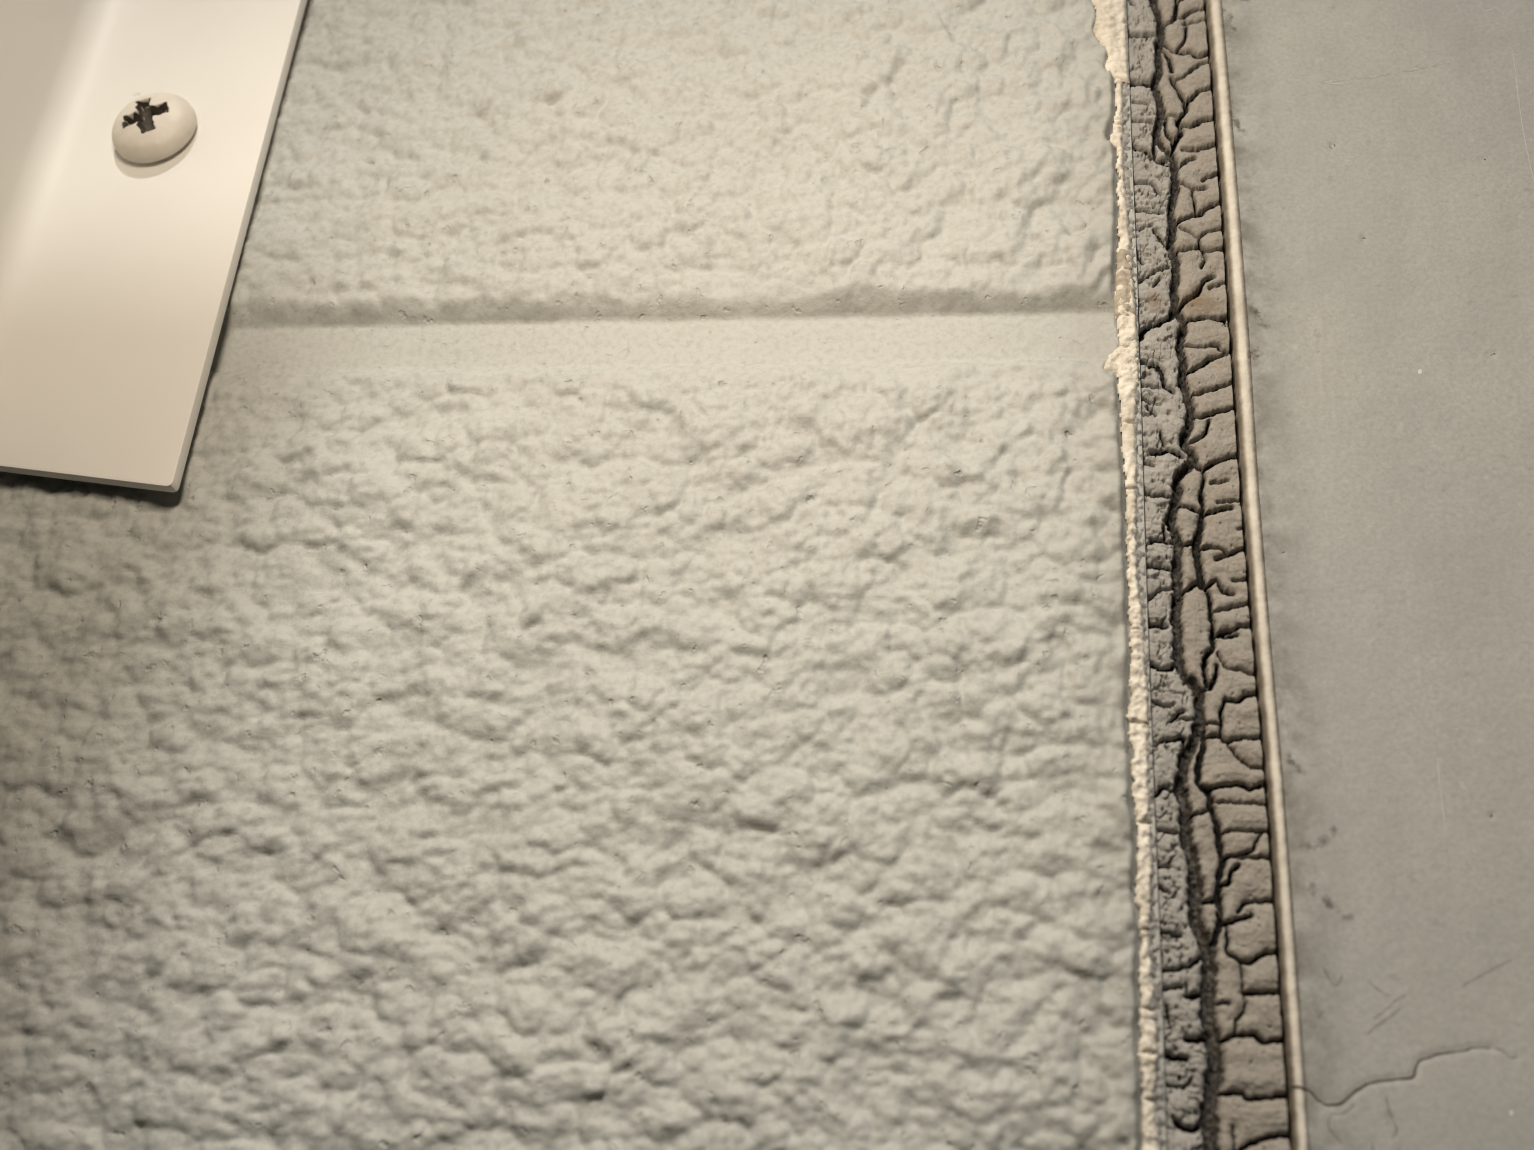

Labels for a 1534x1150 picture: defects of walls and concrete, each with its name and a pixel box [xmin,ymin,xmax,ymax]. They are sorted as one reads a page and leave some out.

spalling [1091,0,1159,1150]
crack [1129,0,1491,1150]